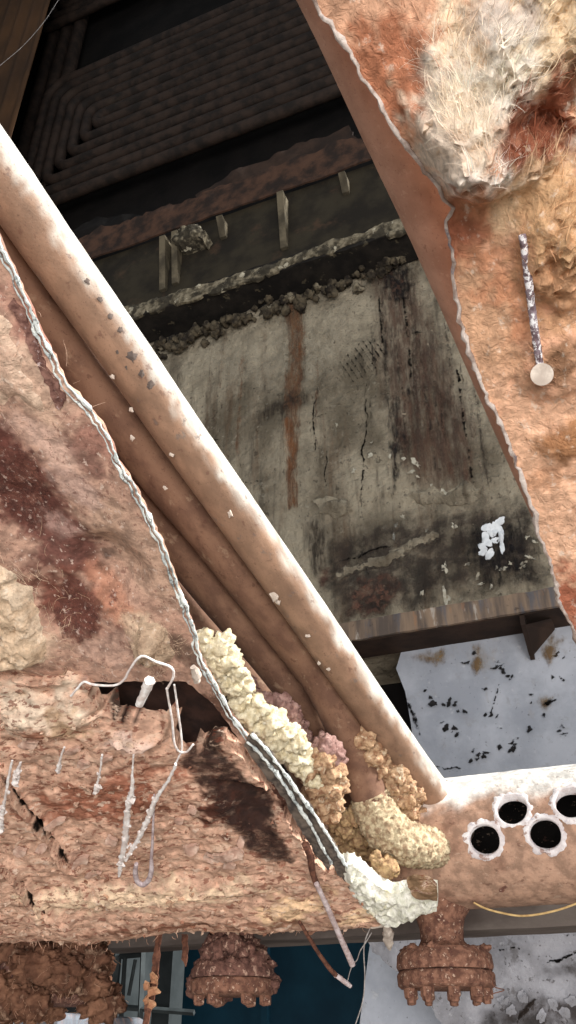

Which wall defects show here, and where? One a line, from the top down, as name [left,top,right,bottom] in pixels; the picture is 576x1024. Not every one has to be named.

rust [0,444,55,531]
rust [285,305,305,509]
crack [358,384,388,513]
water stain [371,265,488,490]
water stain [309,507,541,615]
rust [53,576,116,643]
peeling [0,706,84,770]
peeling [0,763,22,820]
crack [4,779,68,863]
peeling [43,741,246,938]
peeling [0,901,64,945]
crack [20,880,45,914]